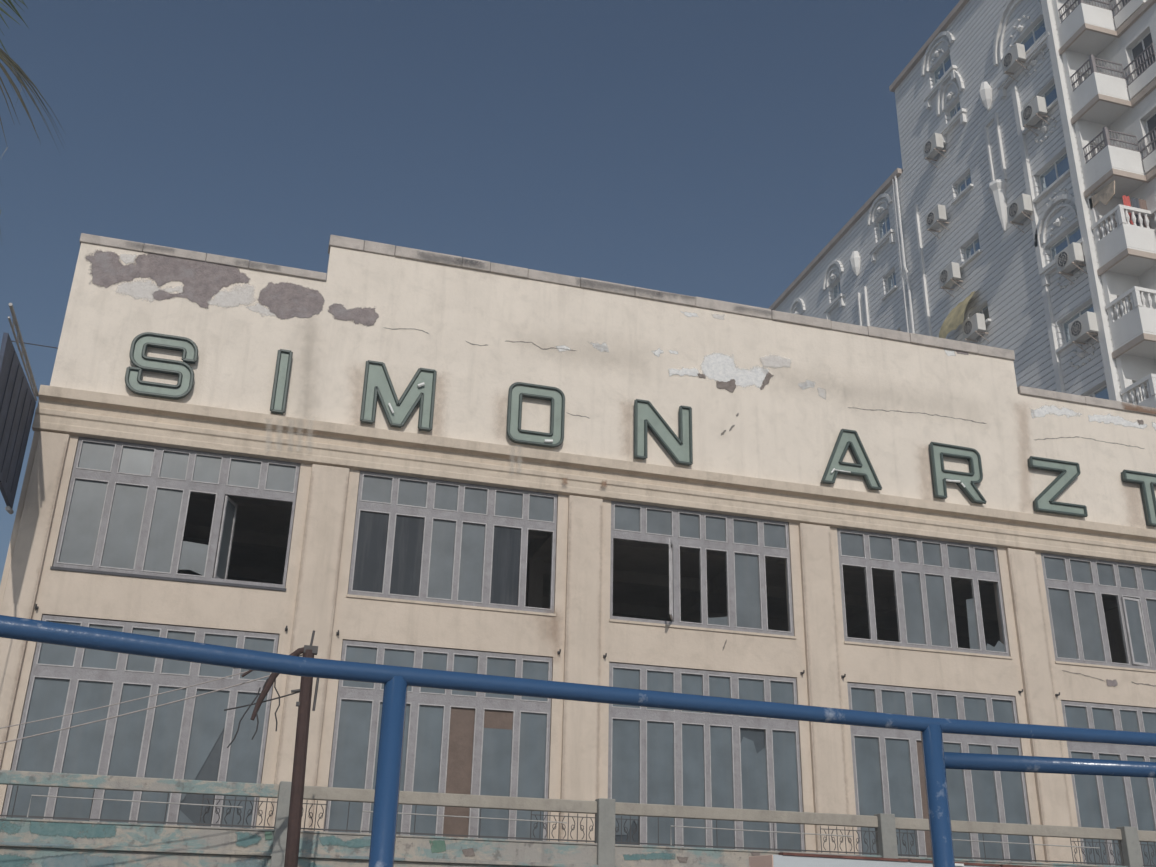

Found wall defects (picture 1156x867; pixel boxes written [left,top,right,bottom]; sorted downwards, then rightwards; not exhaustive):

flaking render [85,250,379,326]
peeling [668,353,791,393]
peeling [0,821,117,867]
peeling [235,831,273,867]